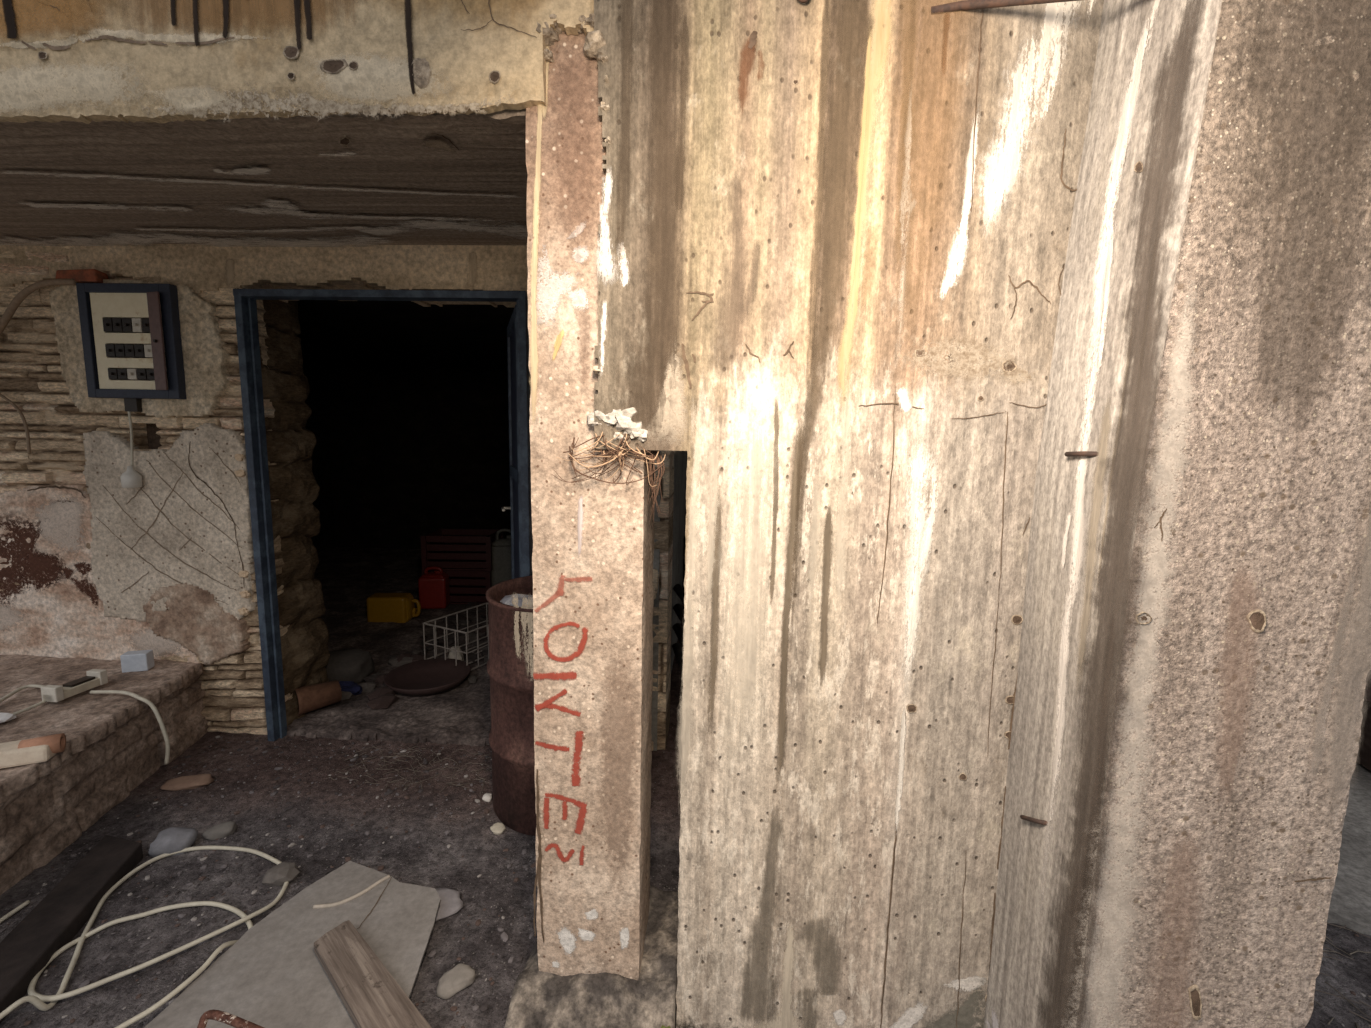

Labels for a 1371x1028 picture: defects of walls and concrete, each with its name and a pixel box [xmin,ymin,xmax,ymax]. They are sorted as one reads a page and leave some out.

damp [139,0,332,27]
damp [535,0,632,372]
damp [628,0,688,426]
damp [899,100,915,325]
damp [940,0,1096,298]
damp [770,0,890,781]
peeling [0,517,99,609]
crack [188,444,244,584]
damp [708,492,721,723]
damp [901,437,939,681]
damp [1041,0,1203,1028]
damp [741,815,838,1028]